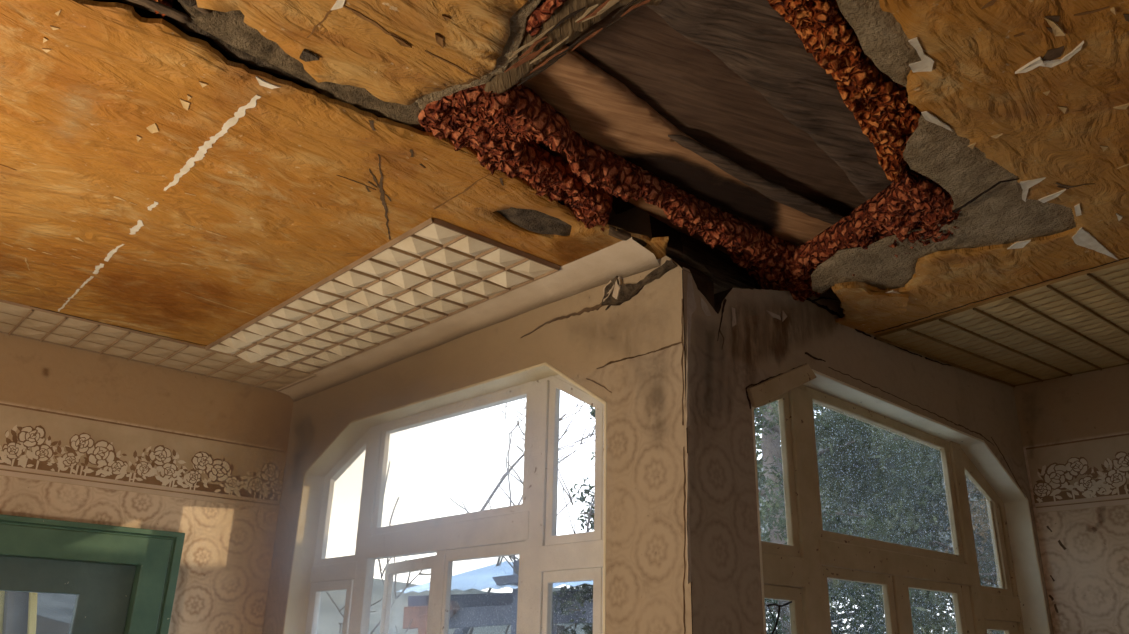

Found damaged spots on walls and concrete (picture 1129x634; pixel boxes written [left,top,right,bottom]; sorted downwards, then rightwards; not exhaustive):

peeling [307,0,541,110]
peeling [836,0,934,87]
peeling [1015,40,1084,74]
peeling [1043,16,1065,36]
crack [120,0,426,240]
peeling [58,95,261,346]
spalling [496,207,572,236]
peeling [811,111,1118,294]
crack [521,286,644,338]